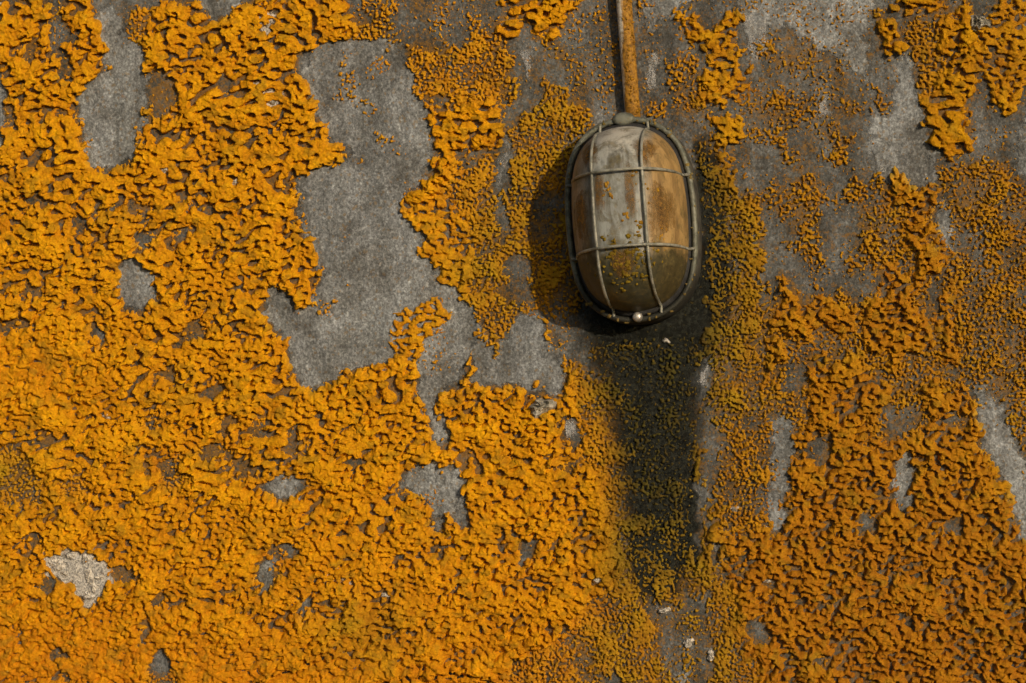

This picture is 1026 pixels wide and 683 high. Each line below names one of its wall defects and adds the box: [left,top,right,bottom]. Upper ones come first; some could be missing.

leakage [575,141,730,608]